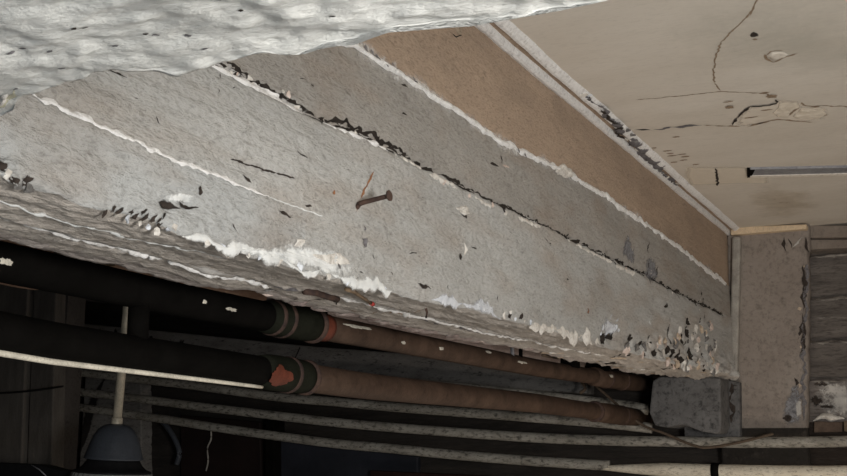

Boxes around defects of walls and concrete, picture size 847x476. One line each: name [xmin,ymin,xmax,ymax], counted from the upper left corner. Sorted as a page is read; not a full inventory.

crack [638,0,769,100]
crack [764,50,797,62]
peeling [723,95,827,127]
spalling [0,158,35,193]
spalling [231,159,294,178]
crack [215,61,740,316]
peeling [626,128,698,186]
peeling [102,186,392,297]
flaking render [781,237,847,258]
spalling [288,289,581,362]
spalling [529,315,720,377]
flaking render [783,264,847,432]